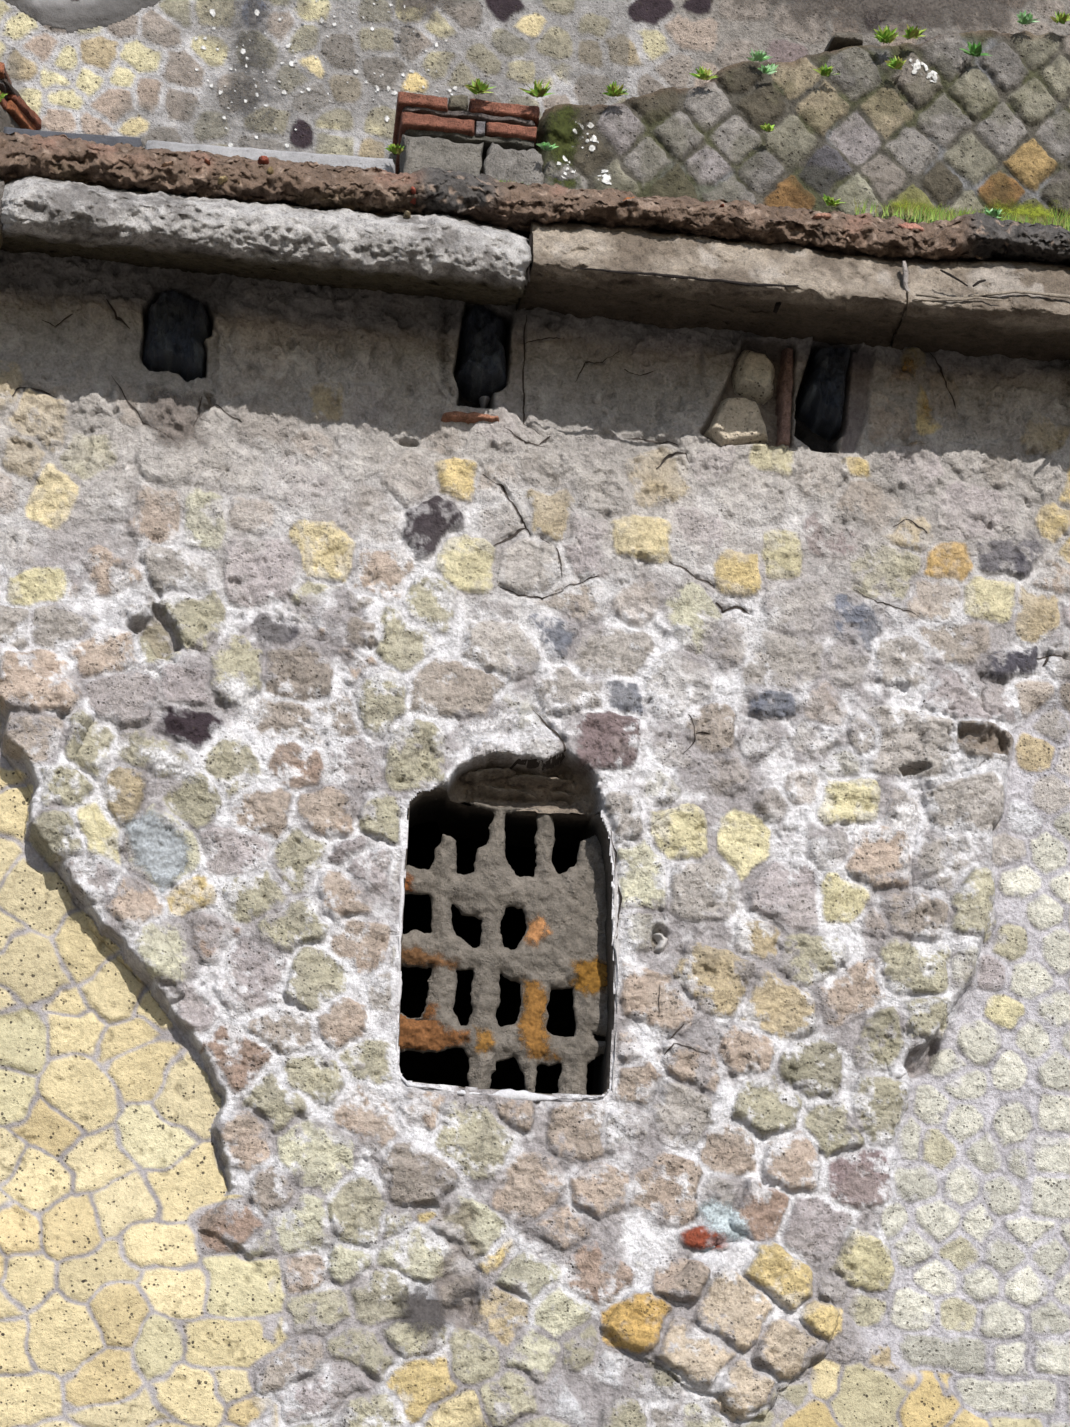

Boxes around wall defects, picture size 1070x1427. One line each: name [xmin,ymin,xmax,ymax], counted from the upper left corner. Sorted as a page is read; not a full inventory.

crack [504,235,653,447]
crack [626,437,689,469]
crack [482,474,599,600]
crack [669,561,749,614]
spalling [121,598,185,662]
spalling [429,750,604,816]
spalling [897,760,934,777]
spalling [650,921,671,956]
spalling [902,1016,946,1081]
spalling [427,1197,488,1336]